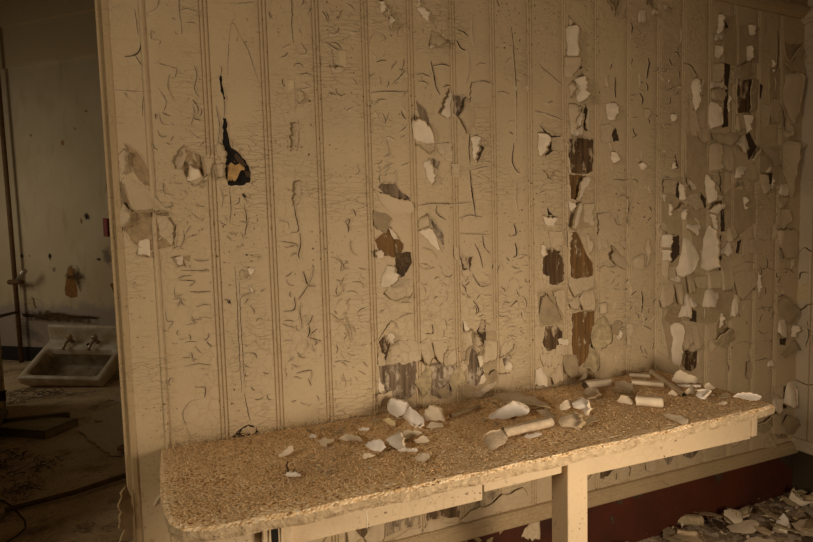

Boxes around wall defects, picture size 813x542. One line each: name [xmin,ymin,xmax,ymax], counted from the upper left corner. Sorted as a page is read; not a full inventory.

crack [114,0,226,162]
peeling [118,143,192,269]
peeling [278,180,304,259]
crack [159,0,563,407]
peeling [373,16,624,450]
peeling [632,14,813,379]
peeling [21,267,99,338]
peeling [617,394,641,413]
peeling [717,392,762,405]
peeling [347,487,528,542]
peeling [521,521,541,541]